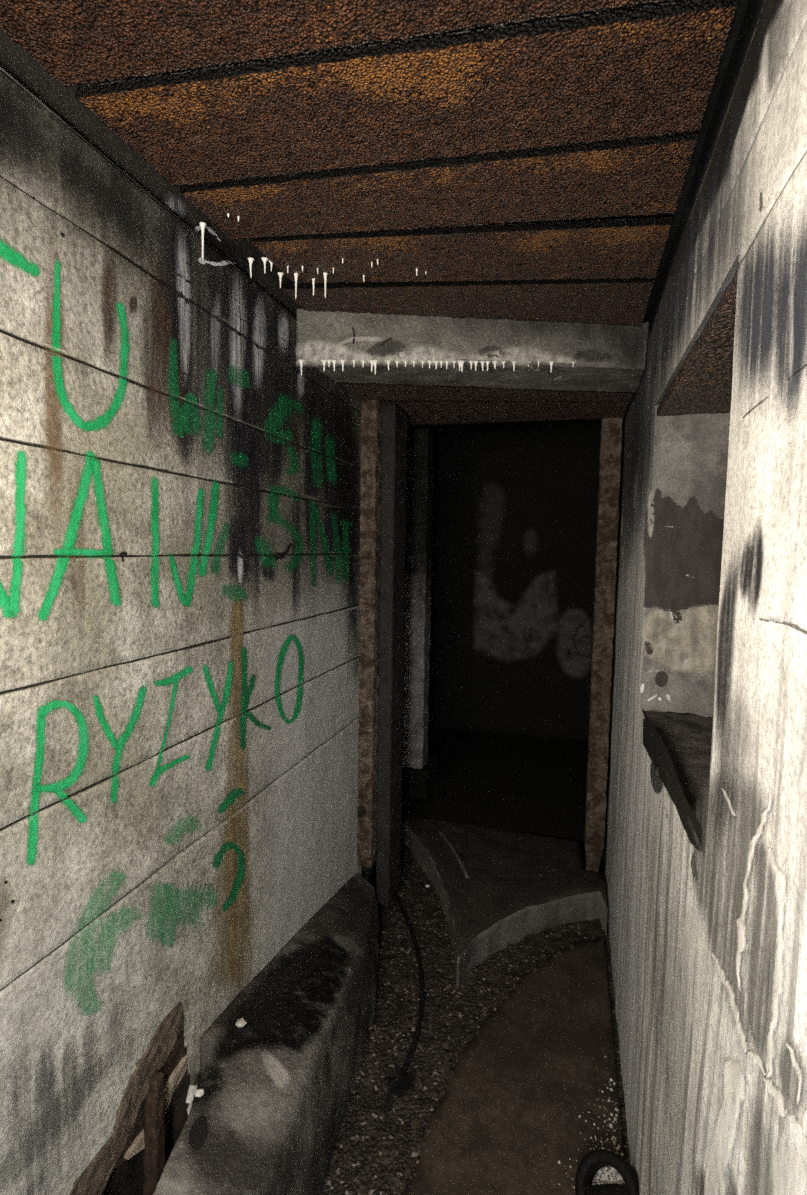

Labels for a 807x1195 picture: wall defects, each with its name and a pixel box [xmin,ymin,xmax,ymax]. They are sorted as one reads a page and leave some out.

corrosion [220,597,248,978]
water stain [293,412,359,641]
water stain [171,209,572,588]
water stain [741,244,807,395]
crack [760,618,807,635]
crack [712,790,807,1161]